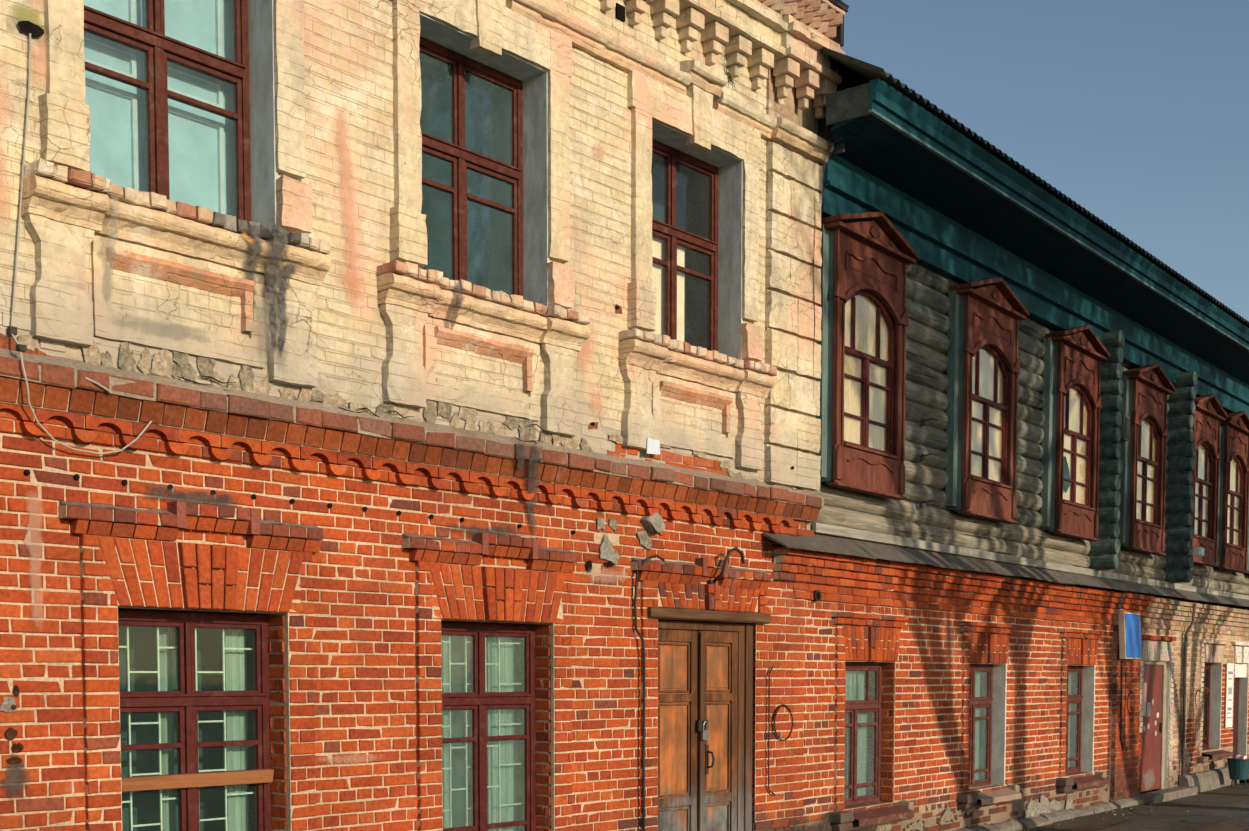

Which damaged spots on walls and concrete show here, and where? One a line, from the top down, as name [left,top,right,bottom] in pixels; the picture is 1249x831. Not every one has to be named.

leakage [242,223,296,353]
peeling [82,334,802,490]